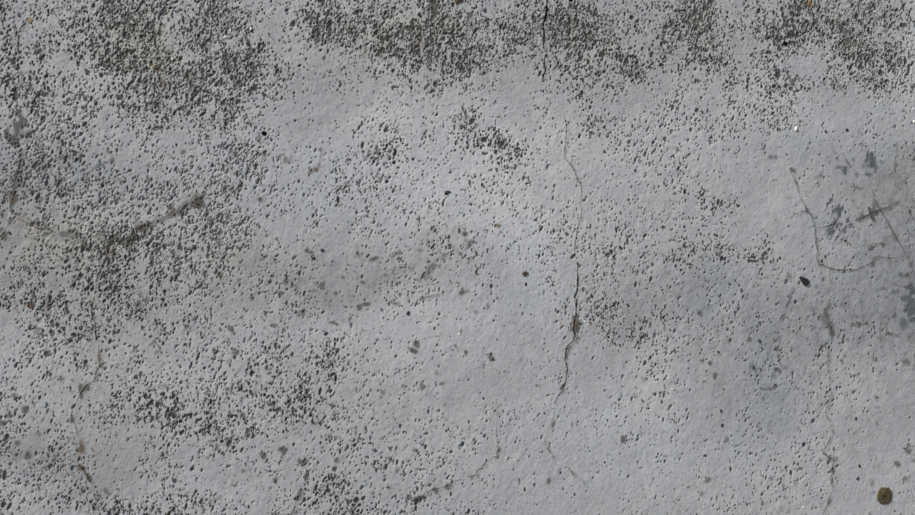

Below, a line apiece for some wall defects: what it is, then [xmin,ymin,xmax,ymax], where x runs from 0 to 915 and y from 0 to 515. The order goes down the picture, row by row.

crack [806,208,892,271]
crack [564,277,580,387]